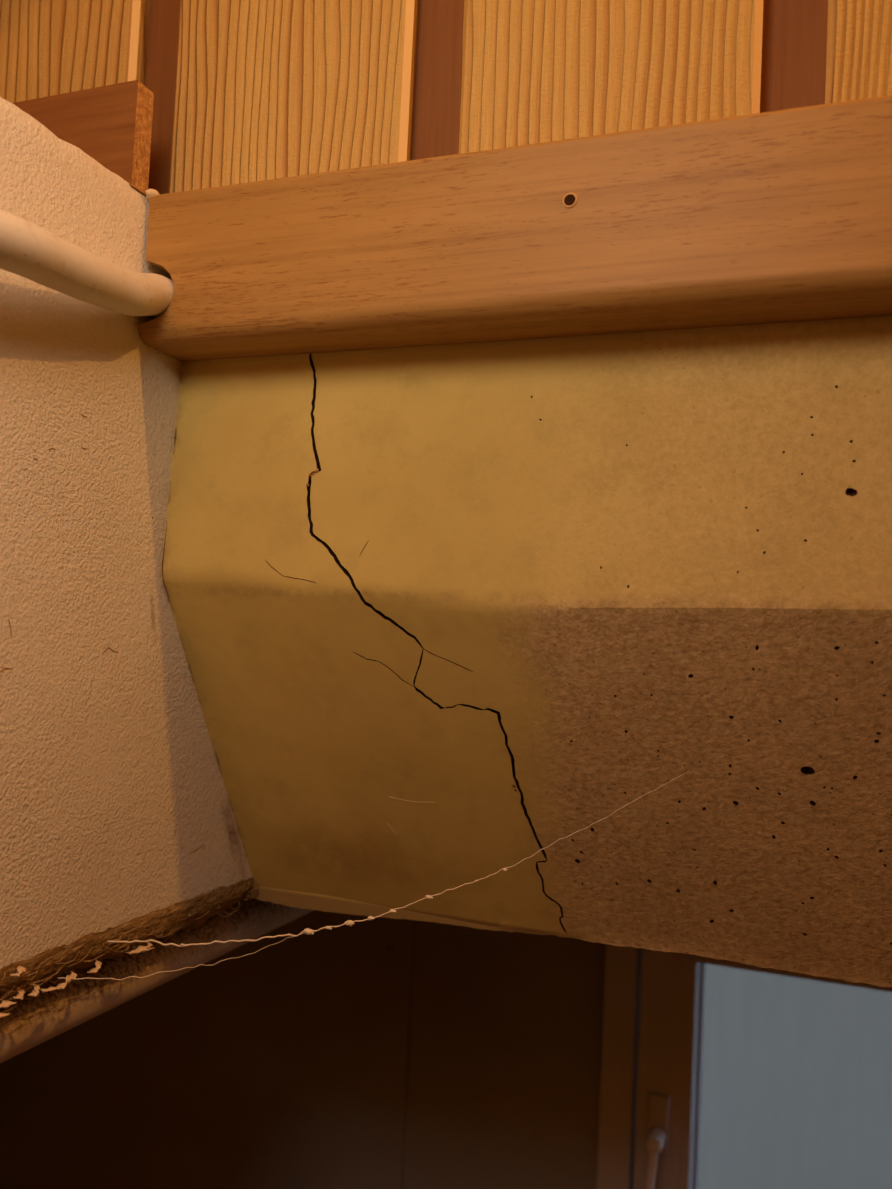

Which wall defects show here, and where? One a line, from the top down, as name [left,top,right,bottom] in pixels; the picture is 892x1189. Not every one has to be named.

crack [306,353,567,934]